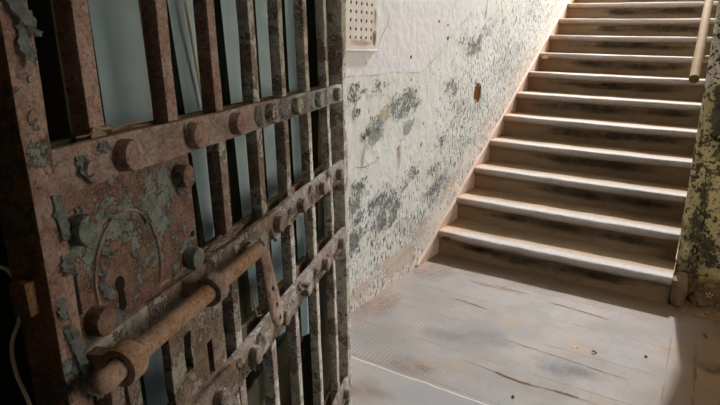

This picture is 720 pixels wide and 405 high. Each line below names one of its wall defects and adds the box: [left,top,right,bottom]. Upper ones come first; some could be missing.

peeling [347,80,389,120]
peeling [357,81,423,148]
peeling [348,160,457,257]
crack [473,363,595,404]